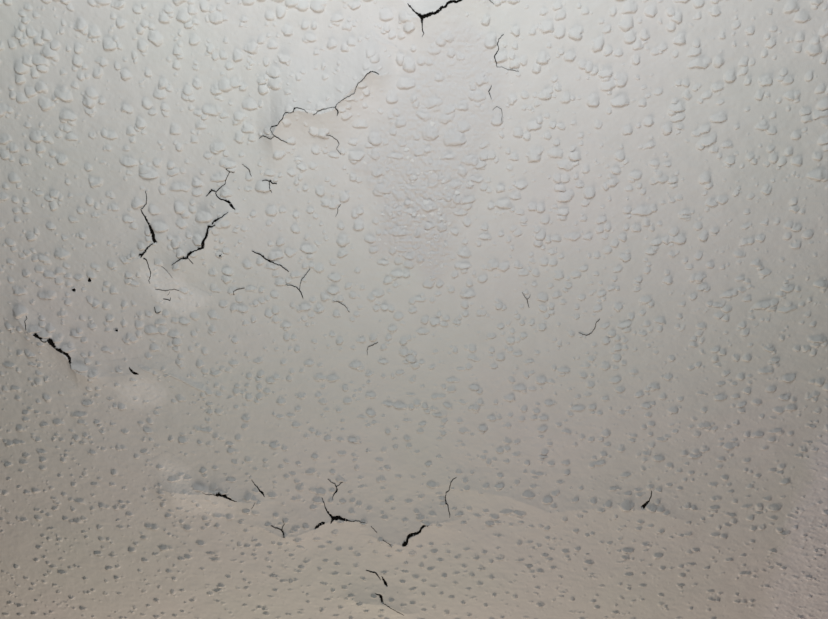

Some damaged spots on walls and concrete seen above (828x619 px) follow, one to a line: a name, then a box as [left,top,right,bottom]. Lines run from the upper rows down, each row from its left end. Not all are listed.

crack [408,0,462,36]
crack [260,71,378,143]
spalling [344,7,511,291]
crack [139,164,277,313]
crack [25,316,71,366]
crack [203,481,265,508]
crack [315,479,428,547]